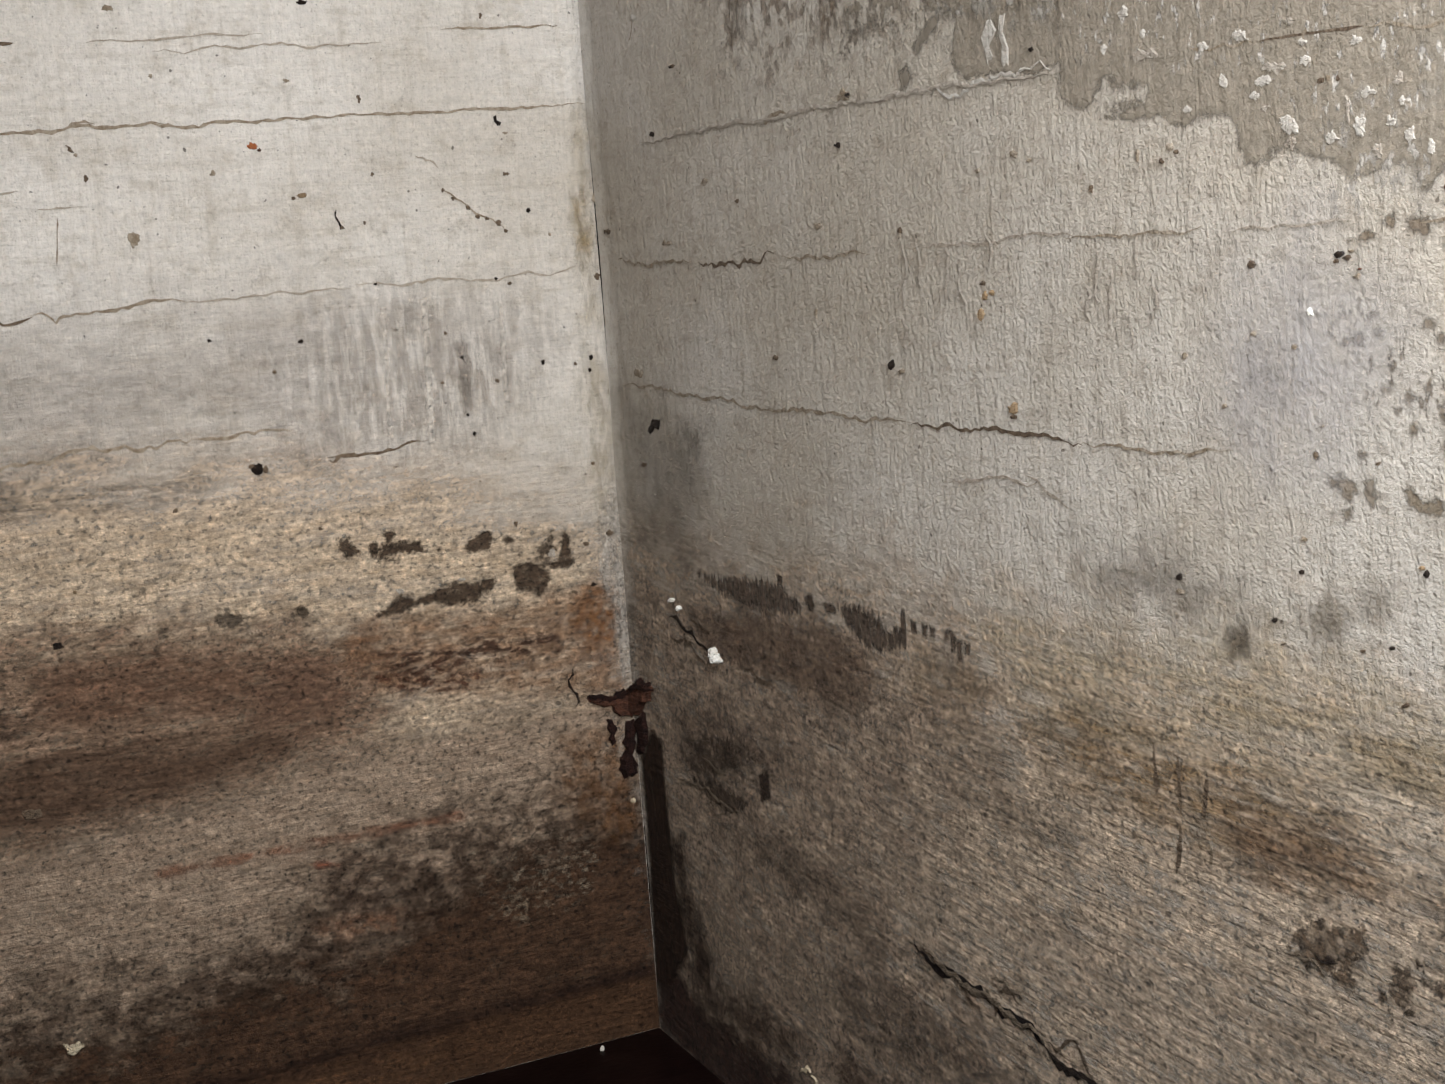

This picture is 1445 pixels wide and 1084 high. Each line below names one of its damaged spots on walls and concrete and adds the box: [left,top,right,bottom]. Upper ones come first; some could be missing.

crack [0,102,585,135]
peeling [845,0,1445,198]
crack [416,156,508,233]
crack [0,266,575,327]
crack [624,383,1232,457]
peeling [339,531,440,562]
peeling [376,577,494,617]
peeling [465,530,513,552]
peeling [513,533,574,596]
peeling [698,570,970,663]
damp [0,466,1445,1084]
crack [913,937,1097,1084]